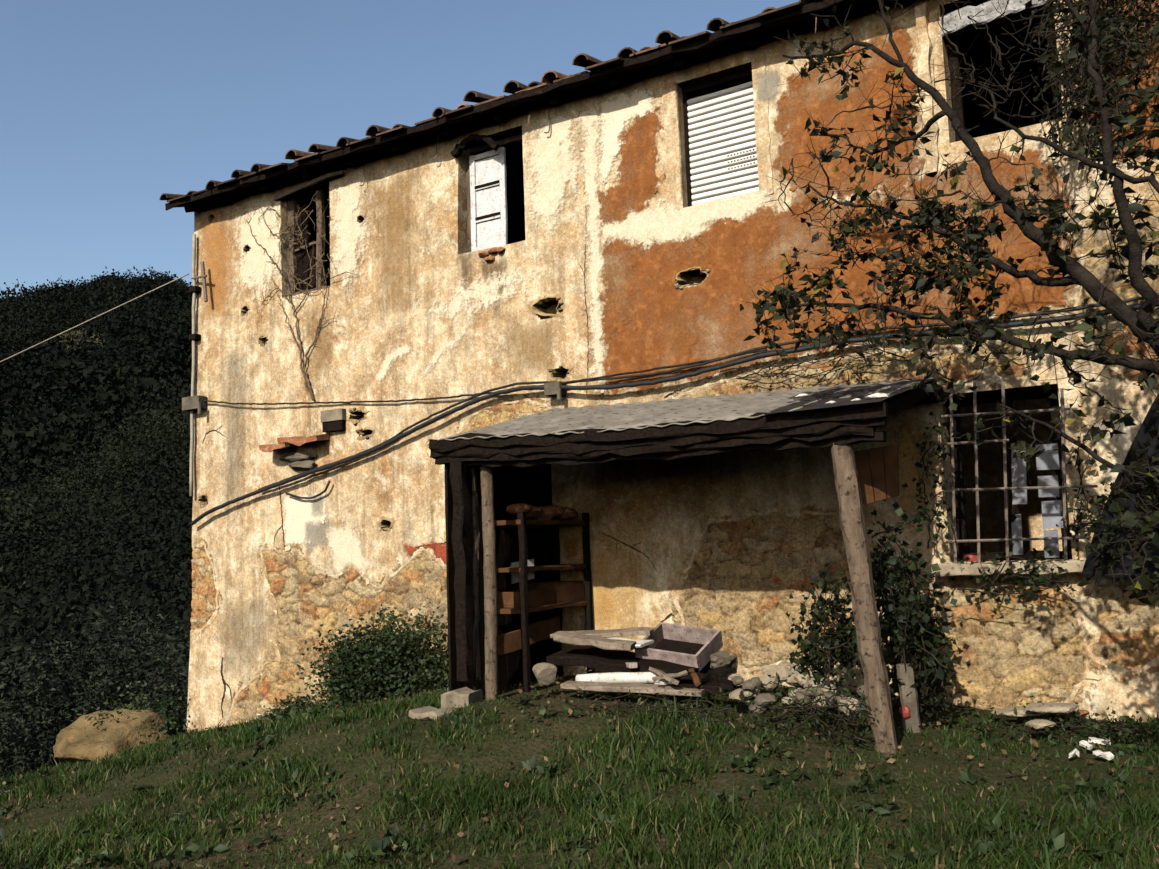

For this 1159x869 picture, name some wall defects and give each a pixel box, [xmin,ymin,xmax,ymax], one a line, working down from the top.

peeling [579,0,1159,400]
spalling [528,292,563,317]
spalling [547,361,574,382]
flaking render [190,537,223,635]
flaking render [223,540,449,726]
flaking render [669,504,858,674]